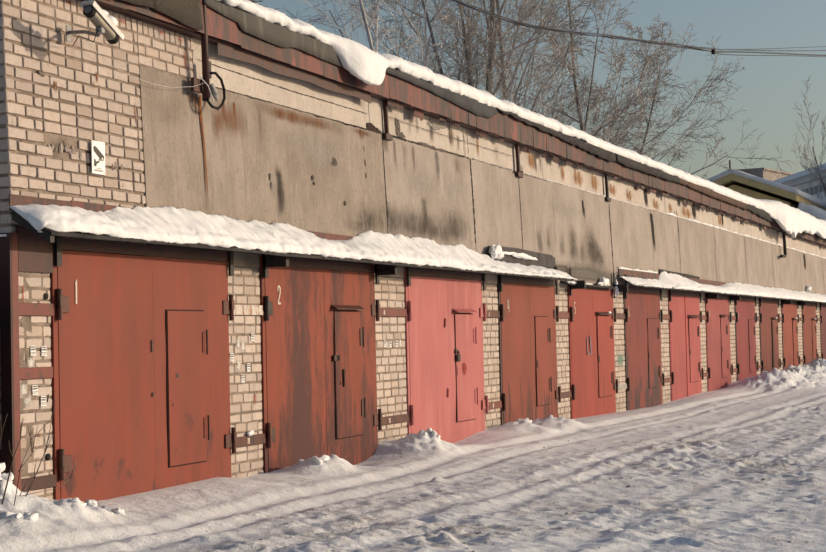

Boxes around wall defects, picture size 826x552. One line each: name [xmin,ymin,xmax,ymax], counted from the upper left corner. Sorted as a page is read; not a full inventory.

corrosion [189,93,208,192]